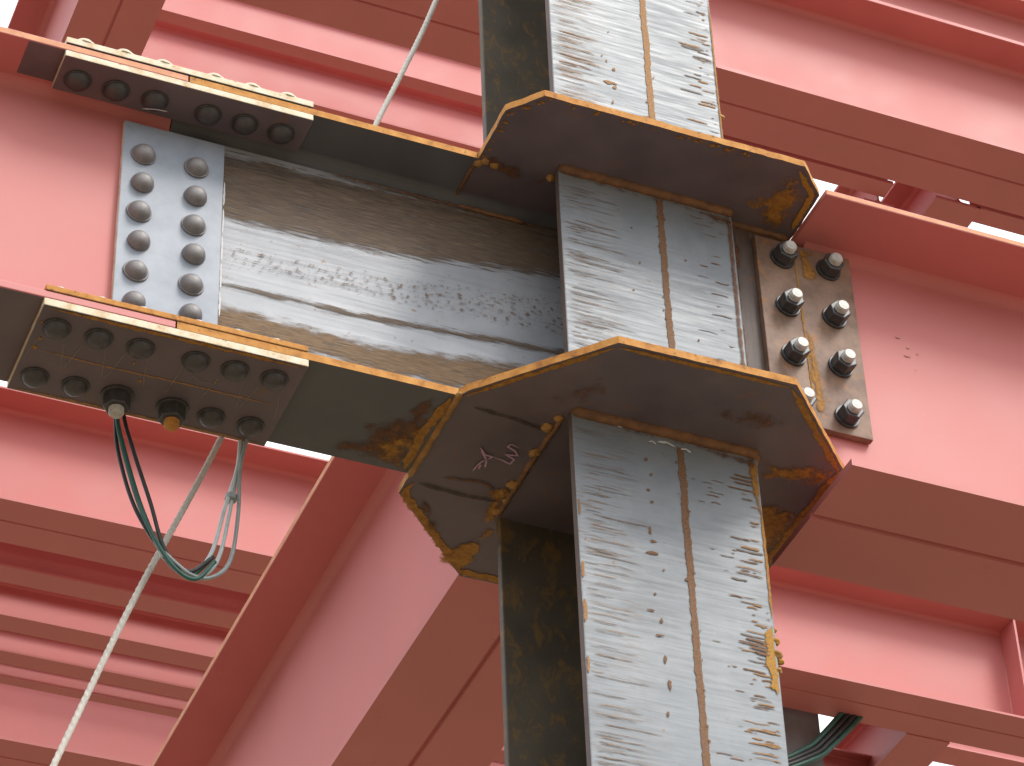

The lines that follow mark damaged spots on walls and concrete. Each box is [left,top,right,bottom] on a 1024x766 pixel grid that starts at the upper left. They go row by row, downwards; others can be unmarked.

corrosion [218,151,840,766]